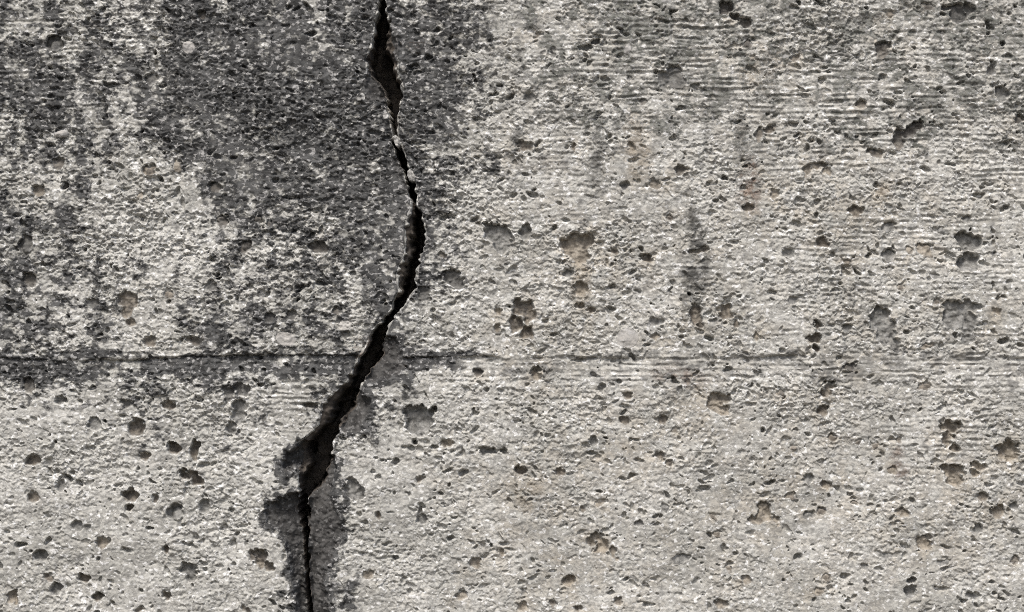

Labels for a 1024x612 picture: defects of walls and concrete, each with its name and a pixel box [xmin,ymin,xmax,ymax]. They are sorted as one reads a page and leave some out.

leakage [0,0,499,612]
crack [264,0,430,612]